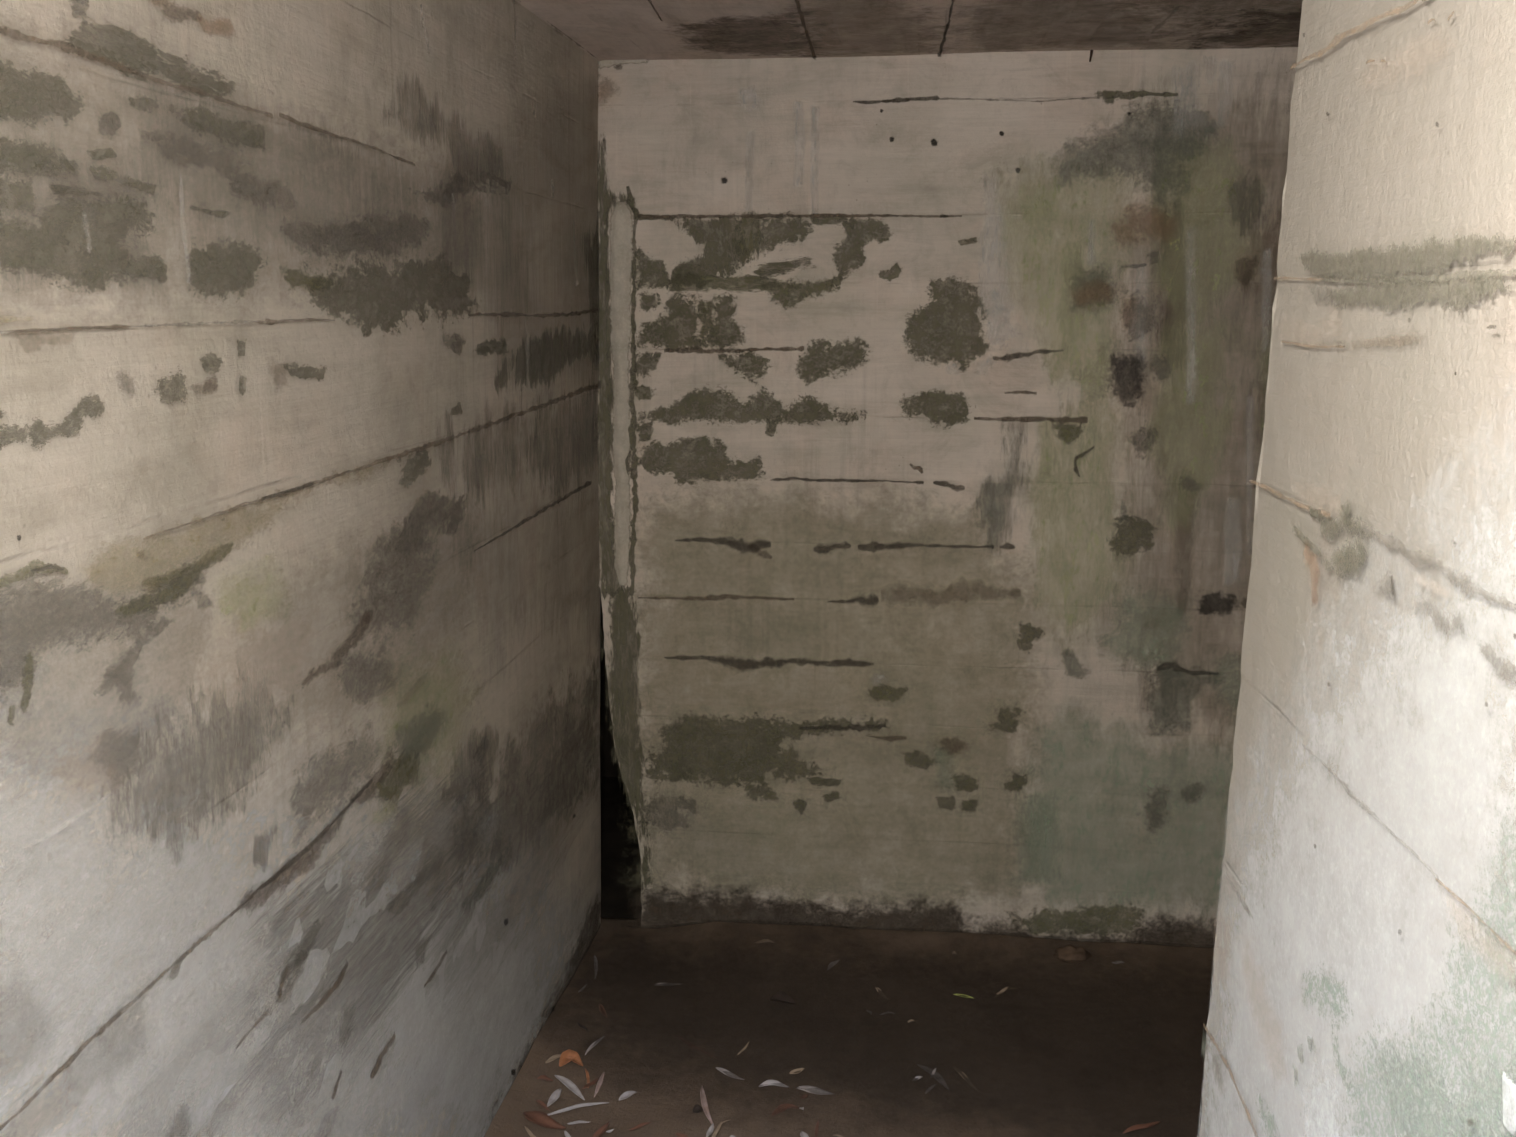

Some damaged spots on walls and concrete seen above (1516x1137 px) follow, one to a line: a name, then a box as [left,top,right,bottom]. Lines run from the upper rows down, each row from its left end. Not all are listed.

crack [937,0,954,57]
crack [1290,0,1425,69]
crack [853,96,993,104]
damp [0,0,613,393]
damp [1022,90,1261,436]
crack [1274,269,1516,284]
damp [1300,232,1516,314]
damp [154,339,247,404]
damp [625,211,894,485]
damp [1061,501,1156,629]
damp [0,526,1516,1137]
crack [1435,878,1516,955]